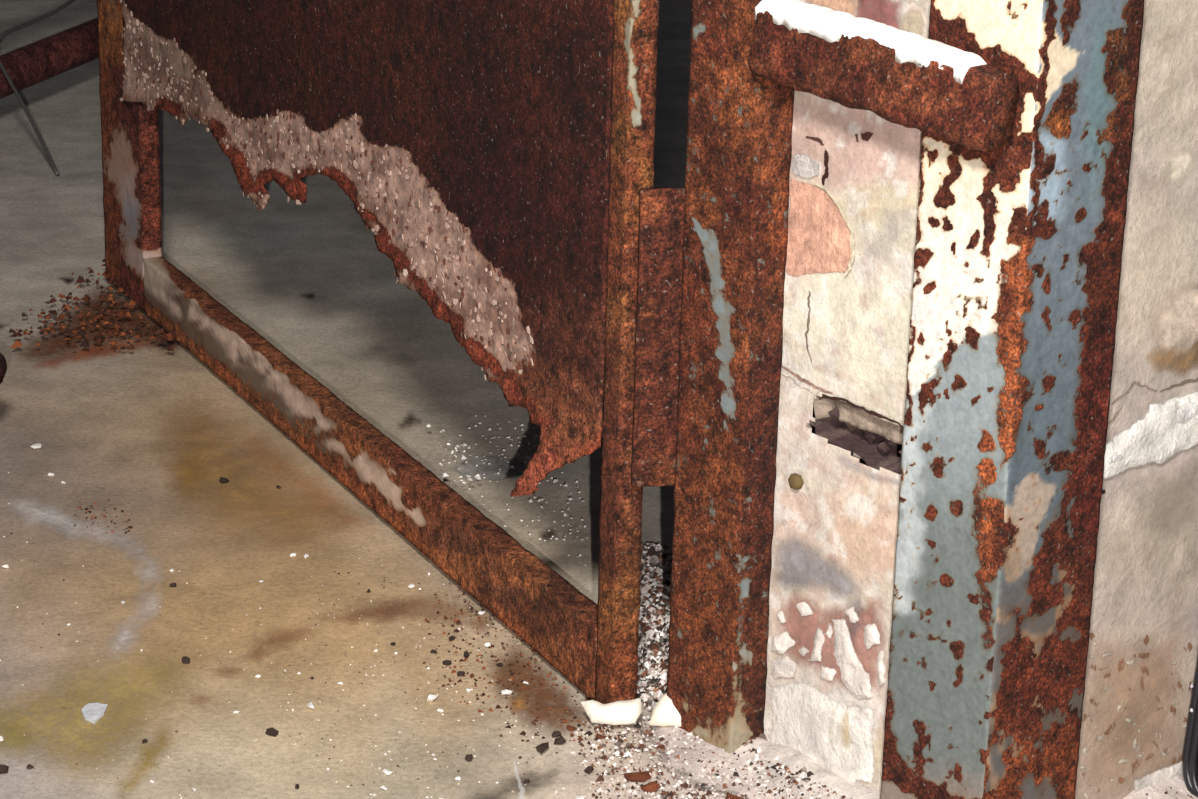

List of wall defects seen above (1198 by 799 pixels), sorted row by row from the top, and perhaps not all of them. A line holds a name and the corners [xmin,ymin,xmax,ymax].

corrosion [120,0,534,374]
corrosion [28,292,182,358]
spalling [808,391,903,478]
crack [1108,378,1198,425]
corrosion [498,656,579,727]
flaking render [771,600,886,703]